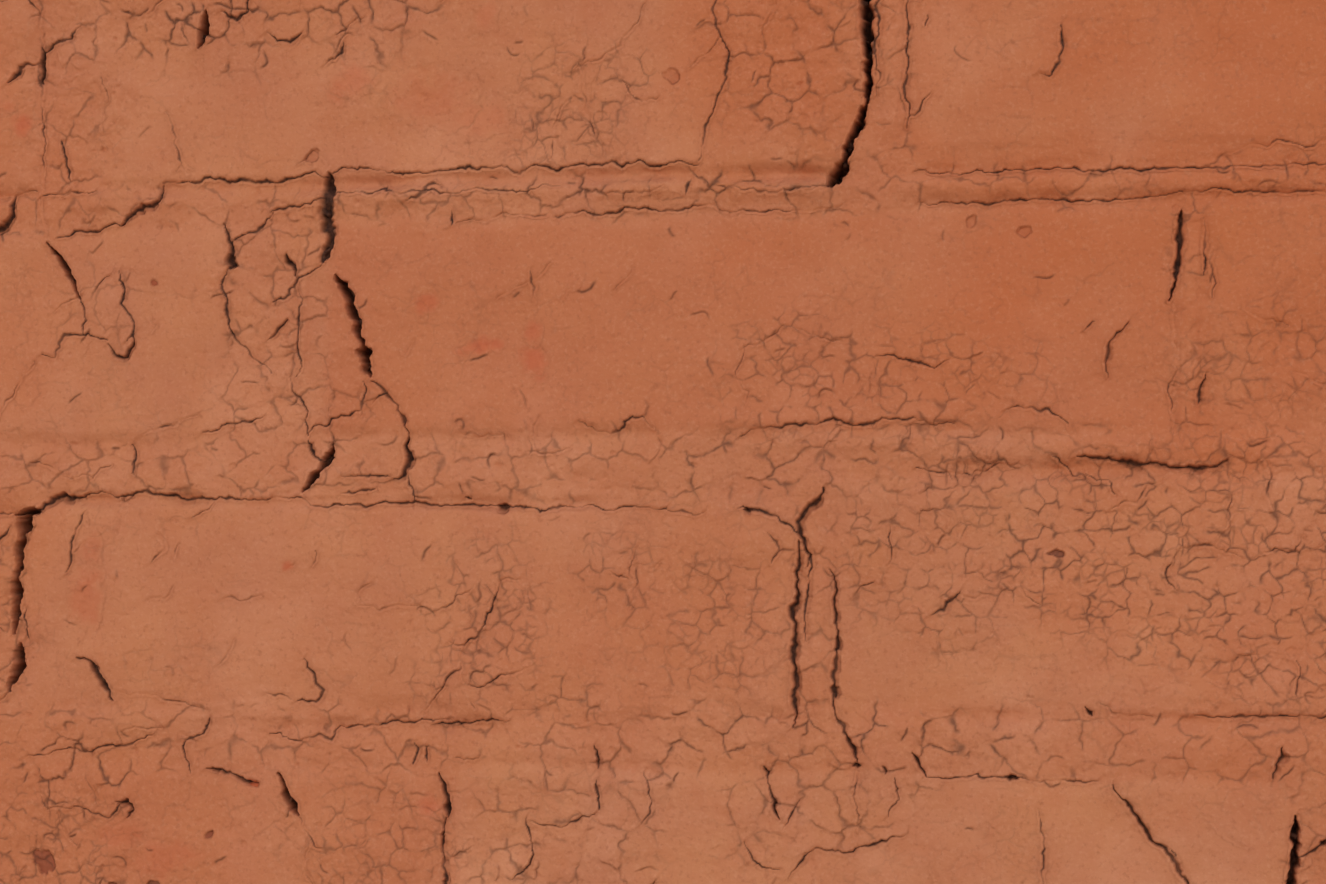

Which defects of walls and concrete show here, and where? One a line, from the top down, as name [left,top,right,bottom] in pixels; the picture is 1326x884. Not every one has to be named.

crack [1036,21,1068,79]
crack [0,0,957,702]
crack [913,135,1326,593]
crack [25,574,535,884]
crack [491,743,603,883]
crack [638,769,654,827]
crack [735,456,1193,884]
crack [1191,648,1326,781]
crack [1283,813,1326,884]